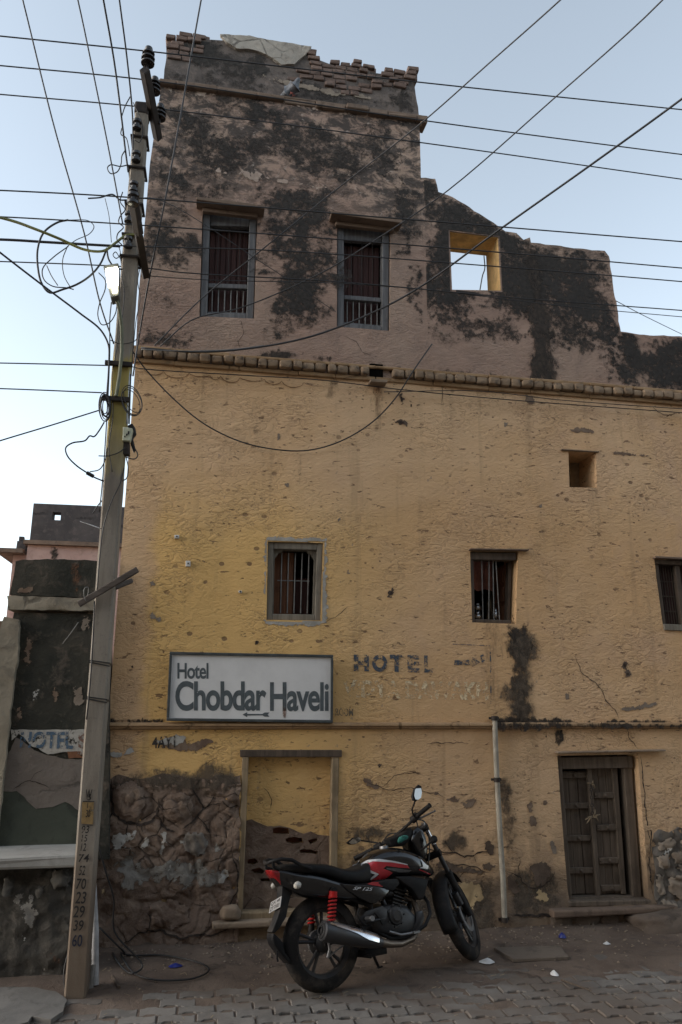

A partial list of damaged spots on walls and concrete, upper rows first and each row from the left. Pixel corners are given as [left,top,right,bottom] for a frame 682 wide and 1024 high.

damp [497,623,682,746]
crack [576,660,654,896]
flaking render [96,762,329,948]
damp [514,868,558,914]
flaking render [652,827,682,908]